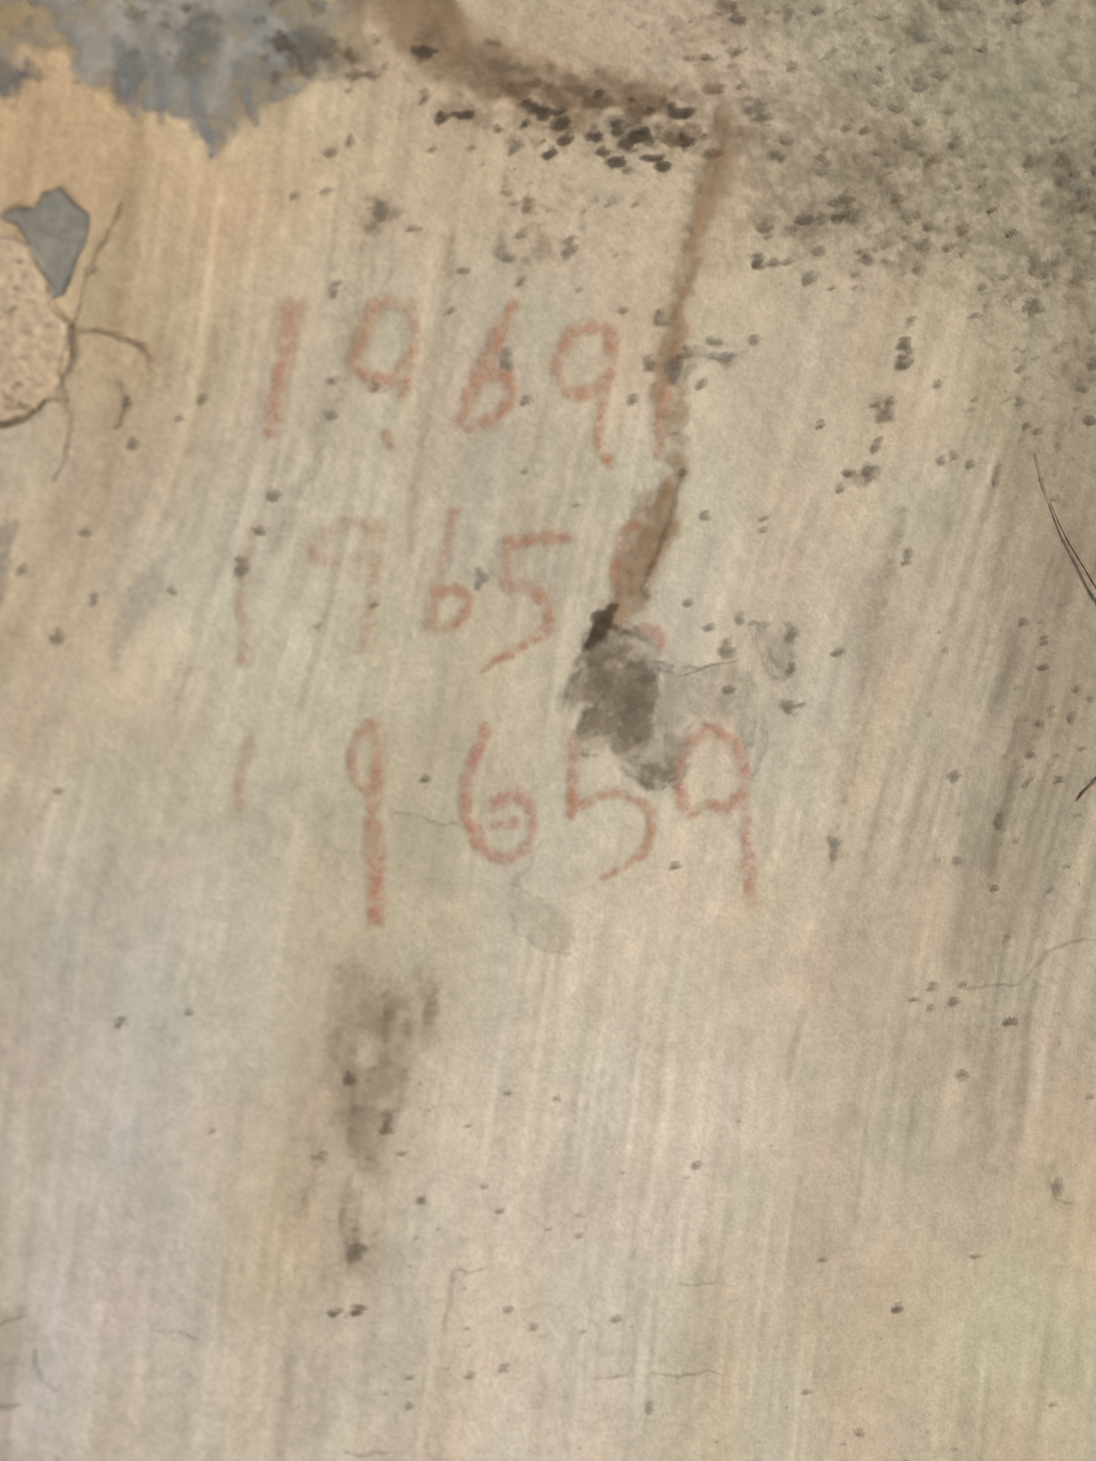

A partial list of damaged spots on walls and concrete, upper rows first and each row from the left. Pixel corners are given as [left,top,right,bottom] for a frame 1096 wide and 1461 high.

peeling [0,0,371,156]
leakage [361,0,740,172]
spalling [0,188,90,428]
peeling [566,603,685,788]